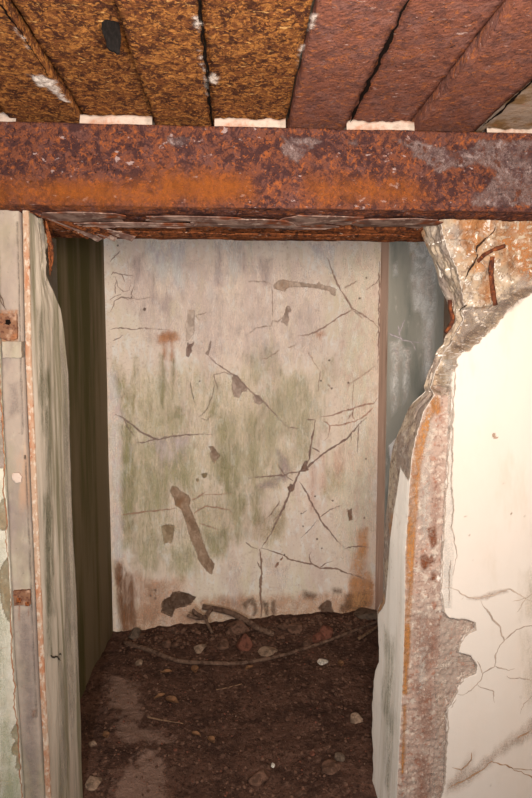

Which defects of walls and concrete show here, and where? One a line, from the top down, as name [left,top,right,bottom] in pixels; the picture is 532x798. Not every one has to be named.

crack [197,0,212,118]
corrosion [282,137,322,162]
corrosion [399,139,532,207]
corrosion [498,221,532,275]
crack [110,251,170,341]
crack [115,258,421,618]
spalling [162,524,175,544]
spalling [170,486,214,574]
water stain [109,371,373,631]
spalling [377,219,532,798]
spalling [0,559,11,621]
crack [448,587,532,738]